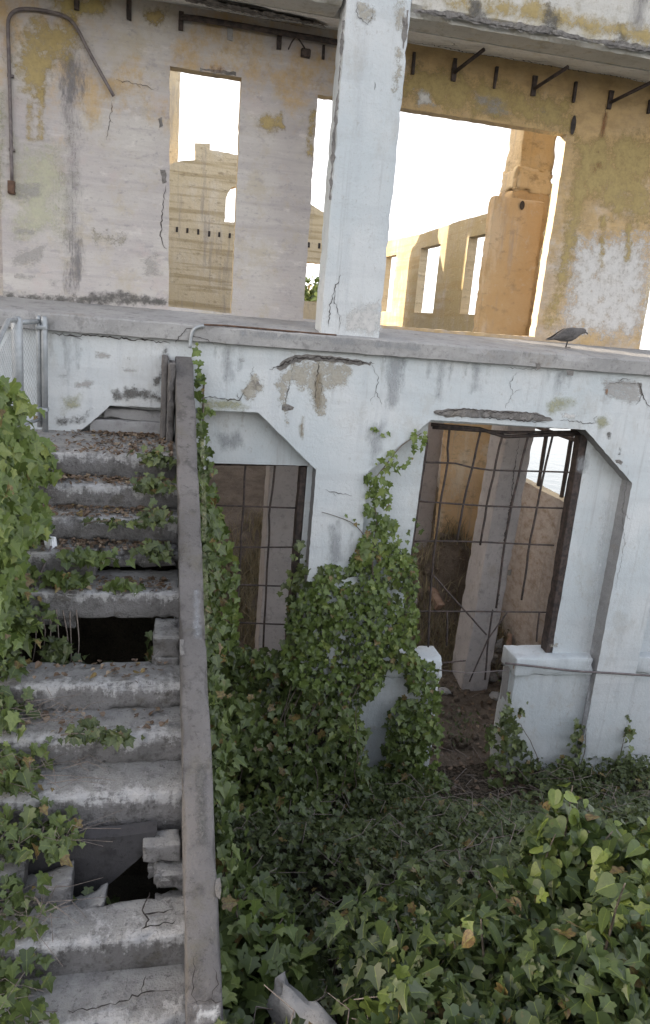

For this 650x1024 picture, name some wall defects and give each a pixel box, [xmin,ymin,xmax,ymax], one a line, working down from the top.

crack [328,276,340,328]
water stain [556,215,650,338]
peeling [270,354,374,424]
spalling [434,408,575,423]
crack [141,893,175,933]
crack [68,959,221,1013]